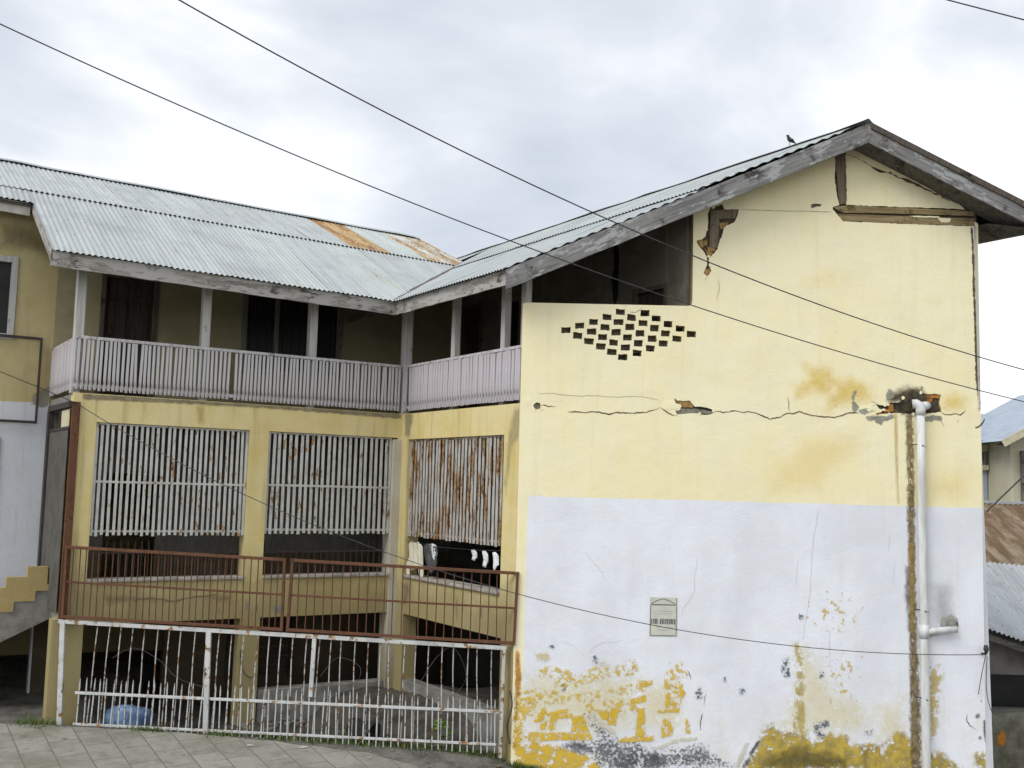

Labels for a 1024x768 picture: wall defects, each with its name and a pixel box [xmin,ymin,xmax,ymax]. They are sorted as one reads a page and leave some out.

flaking render [696,205,738,276]
crack [540,393,674,416]
crack [716,399,859,419]
flaking render [852,386,942,425]
water stain [743,388,957,768]
peeling [664,663,688,706]
peeling [513,654,647,768]